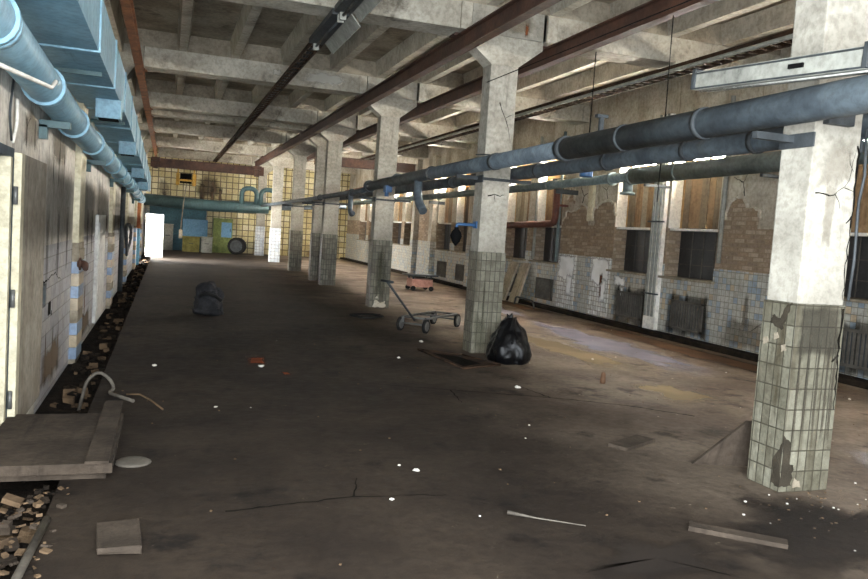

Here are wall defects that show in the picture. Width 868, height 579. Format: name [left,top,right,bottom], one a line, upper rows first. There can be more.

damp [53,138,65,176]
spalling [562,187,617,229]
spalling [763,303,793,352]
peeling [770,436,800,488]